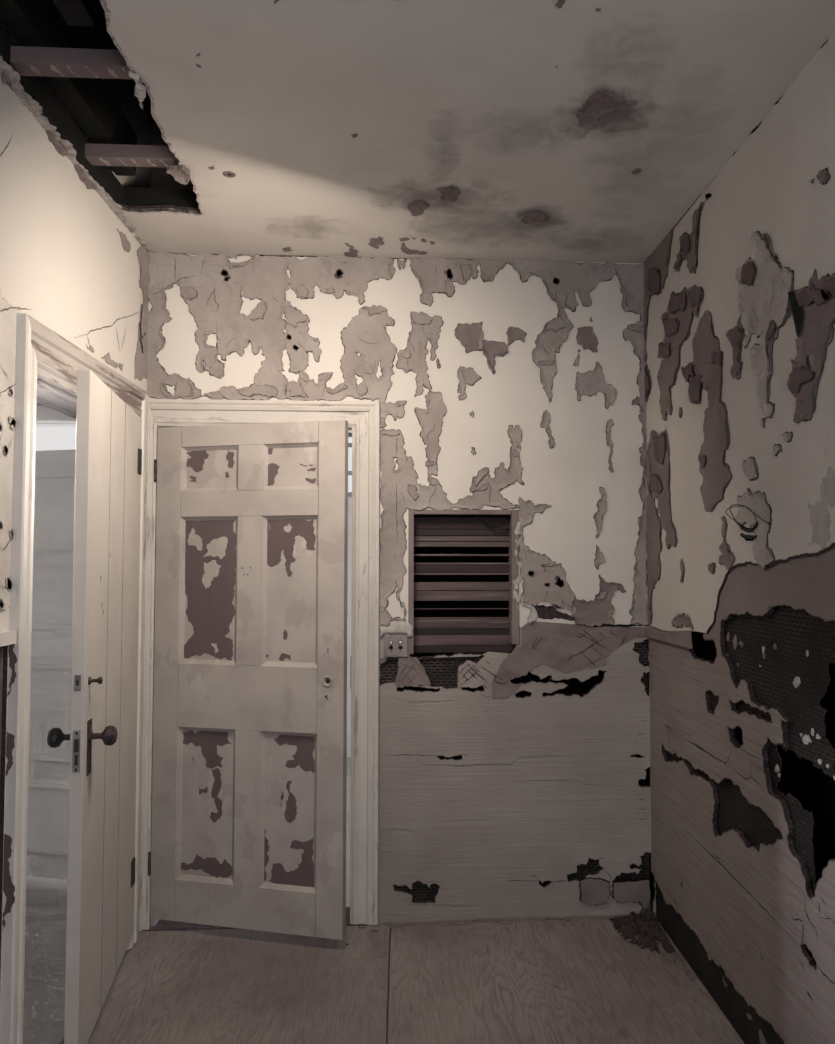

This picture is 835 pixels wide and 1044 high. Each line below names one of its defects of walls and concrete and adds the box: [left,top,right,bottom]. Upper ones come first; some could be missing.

spalling [0,56,205,252]
water stain [407,200,429,216]
water stain [436,185,460,202]
water stain [576,90,637,131]
peeling [184,520,236,661]
peeling [267,519,316,577]
spalling [414,515,509,629]
spalling [661,466,835,899]
peeling [183,730,231,823]
peeling [264,830,314,887]
spalling [567,852,785,1044]
crack [684,829,835,1000]